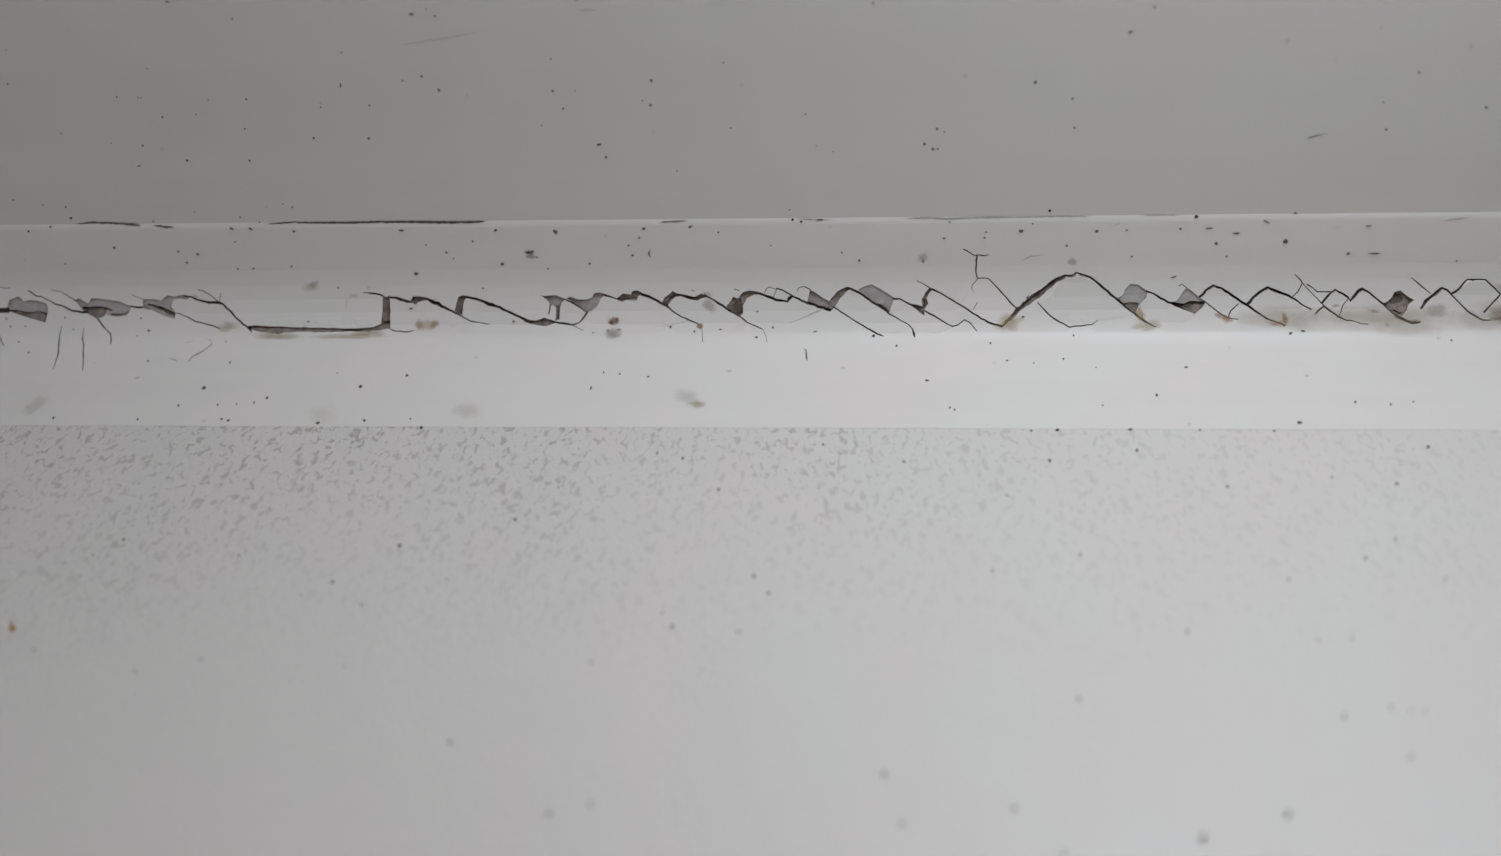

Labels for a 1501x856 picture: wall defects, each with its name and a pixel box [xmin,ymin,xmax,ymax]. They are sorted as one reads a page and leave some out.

crack [0,287,112,371]
crack [171,249,1501,343]